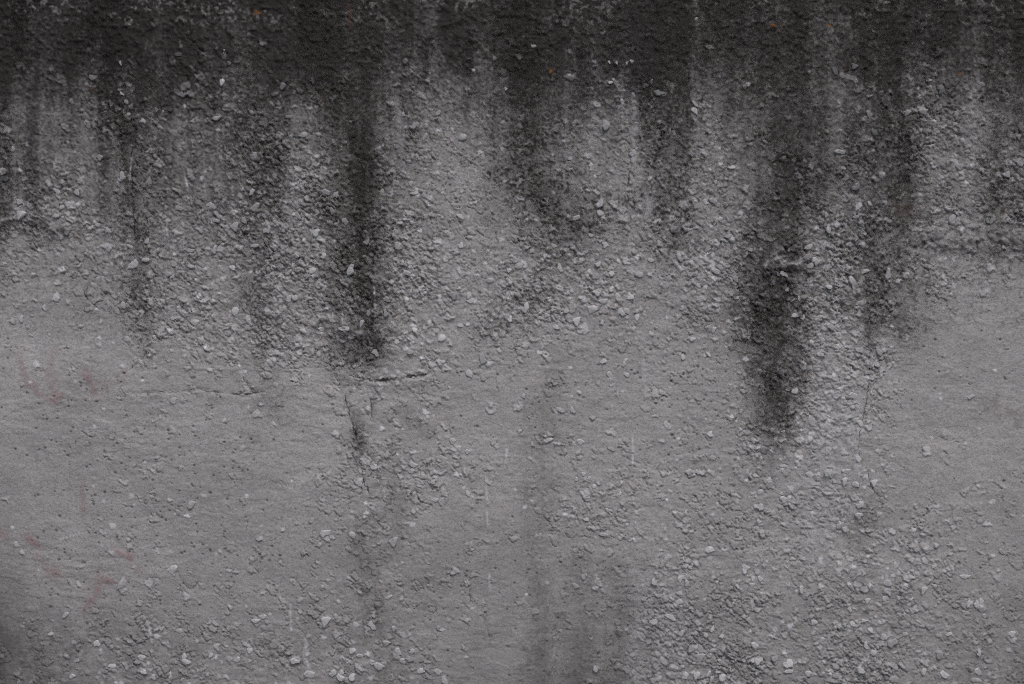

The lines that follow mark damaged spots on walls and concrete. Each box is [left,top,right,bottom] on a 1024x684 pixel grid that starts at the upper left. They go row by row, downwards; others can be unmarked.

water stain [0,0,1024,218]
crack [345,373,426,435]